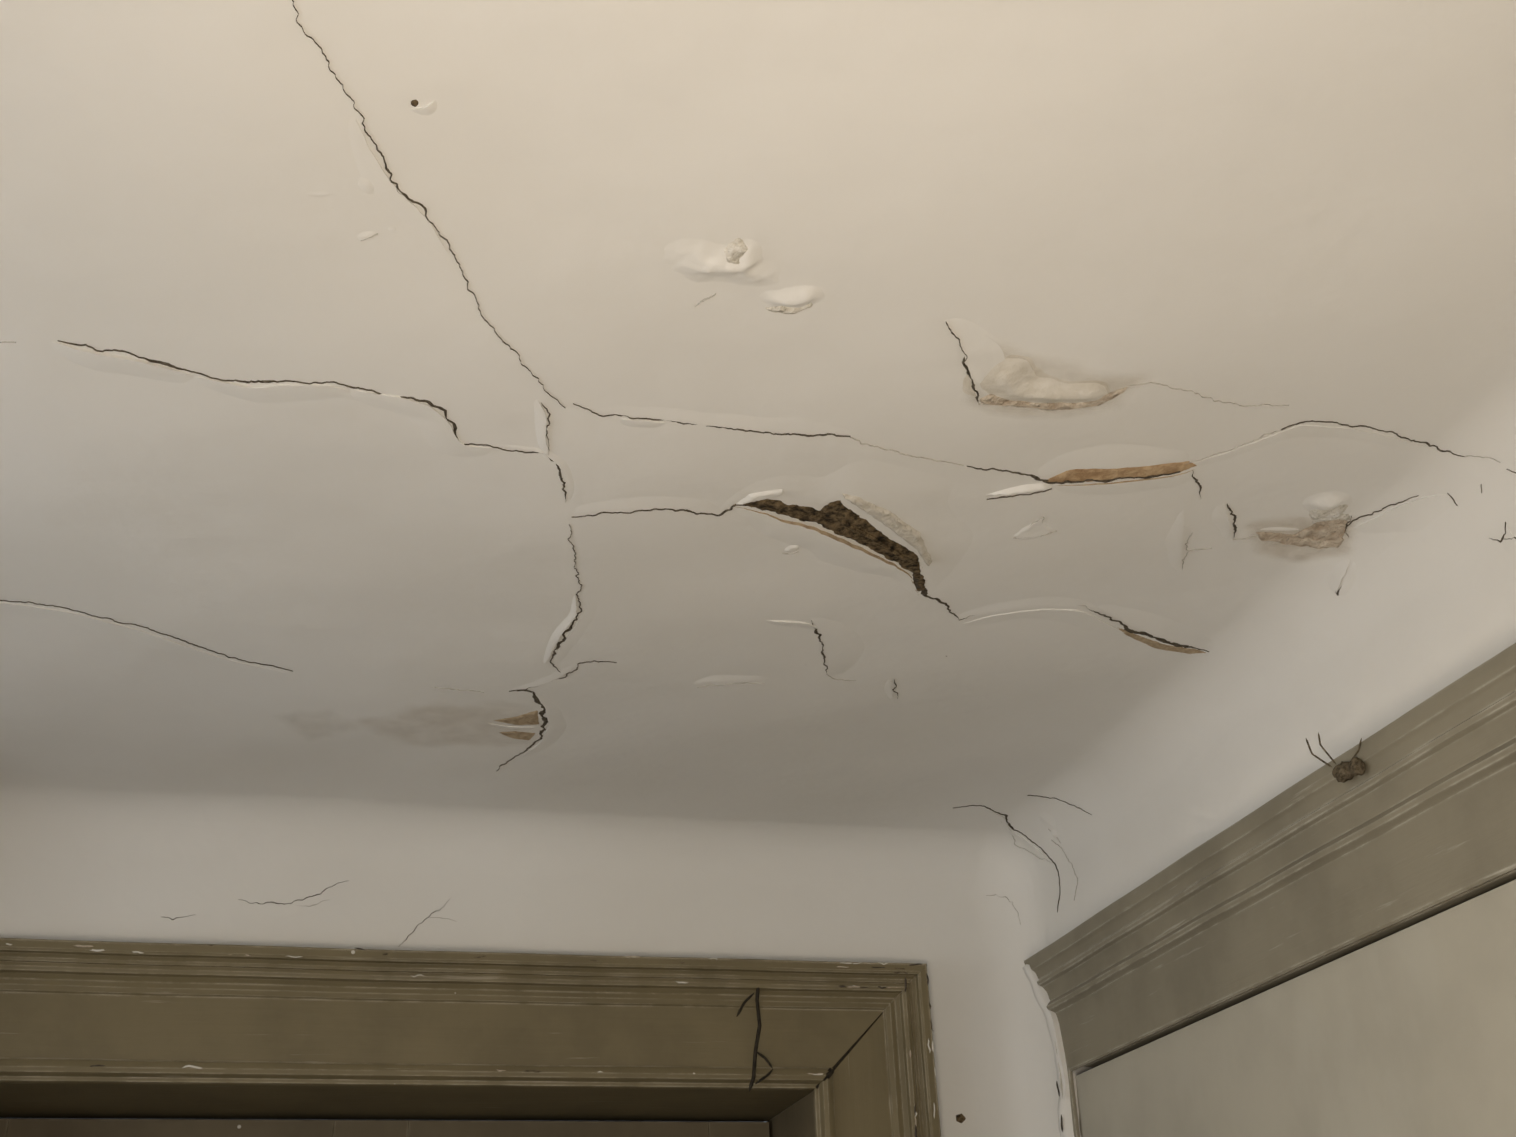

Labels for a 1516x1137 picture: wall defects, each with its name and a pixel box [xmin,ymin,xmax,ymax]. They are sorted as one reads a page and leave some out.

crack [0,0,1516,771]
spalling [1256,491,1450,596]
spalling [487,710,539,740]